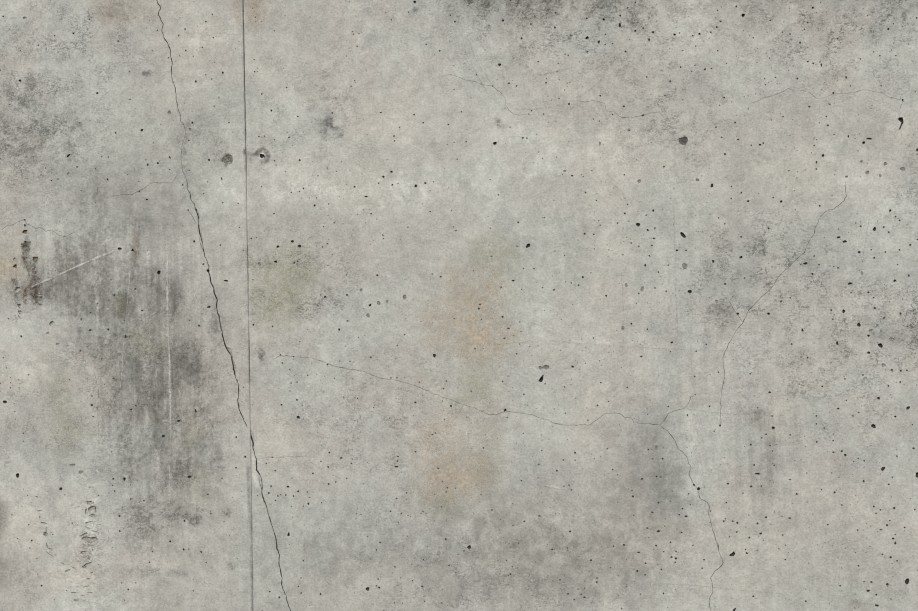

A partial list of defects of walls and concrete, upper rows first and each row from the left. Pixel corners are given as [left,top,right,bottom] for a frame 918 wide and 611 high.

crack [116,0,291,611]
crack [281,355,724,609]